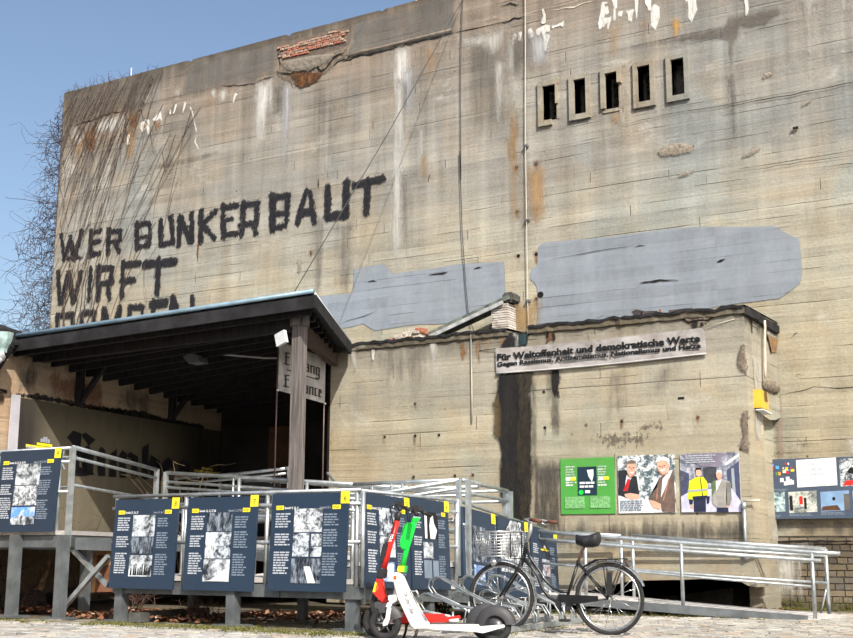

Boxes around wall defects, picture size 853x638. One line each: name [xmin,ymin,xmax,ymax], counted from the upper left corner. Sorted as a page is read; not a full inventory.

spalling [277,27,350,88]
crack [224,2,524,88]
damp [393,50,412,248]
damp [493,369,564,539]
damp [604,523,740,542]